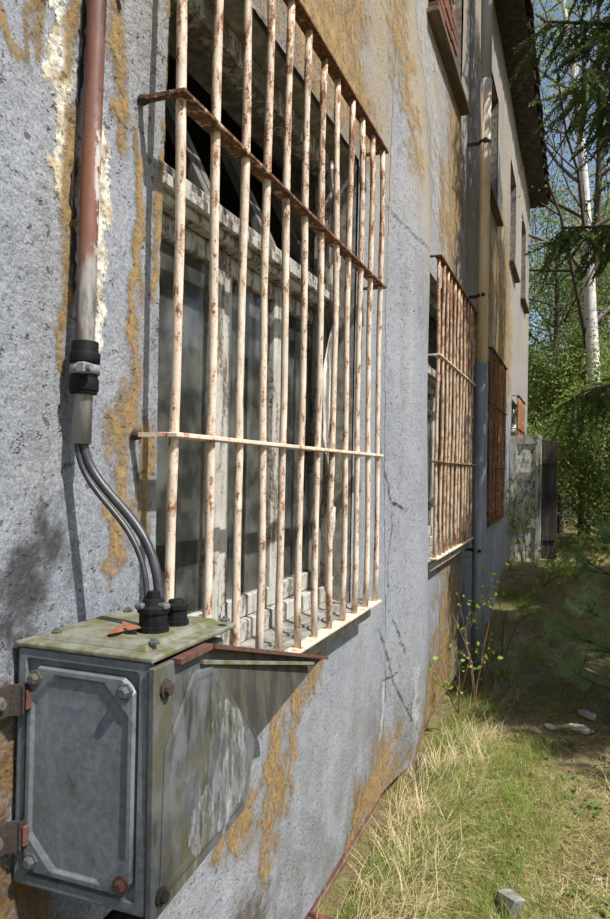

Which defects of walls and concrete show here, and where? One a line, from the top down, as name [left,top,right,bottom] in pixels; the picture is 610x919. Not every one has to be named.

water stain [0,0,45,60]
water stain [58,0,82,82]
water stain [261,0,379,153]
water stain [418,0,442,212]
water stain [55,106,81,375]
water stain [101,0,165,579]
crack [378,620,415,728]
corrosion [0,716,17,824]
corrosion [253,651,325,886]
corrosion [0,855,62,919]